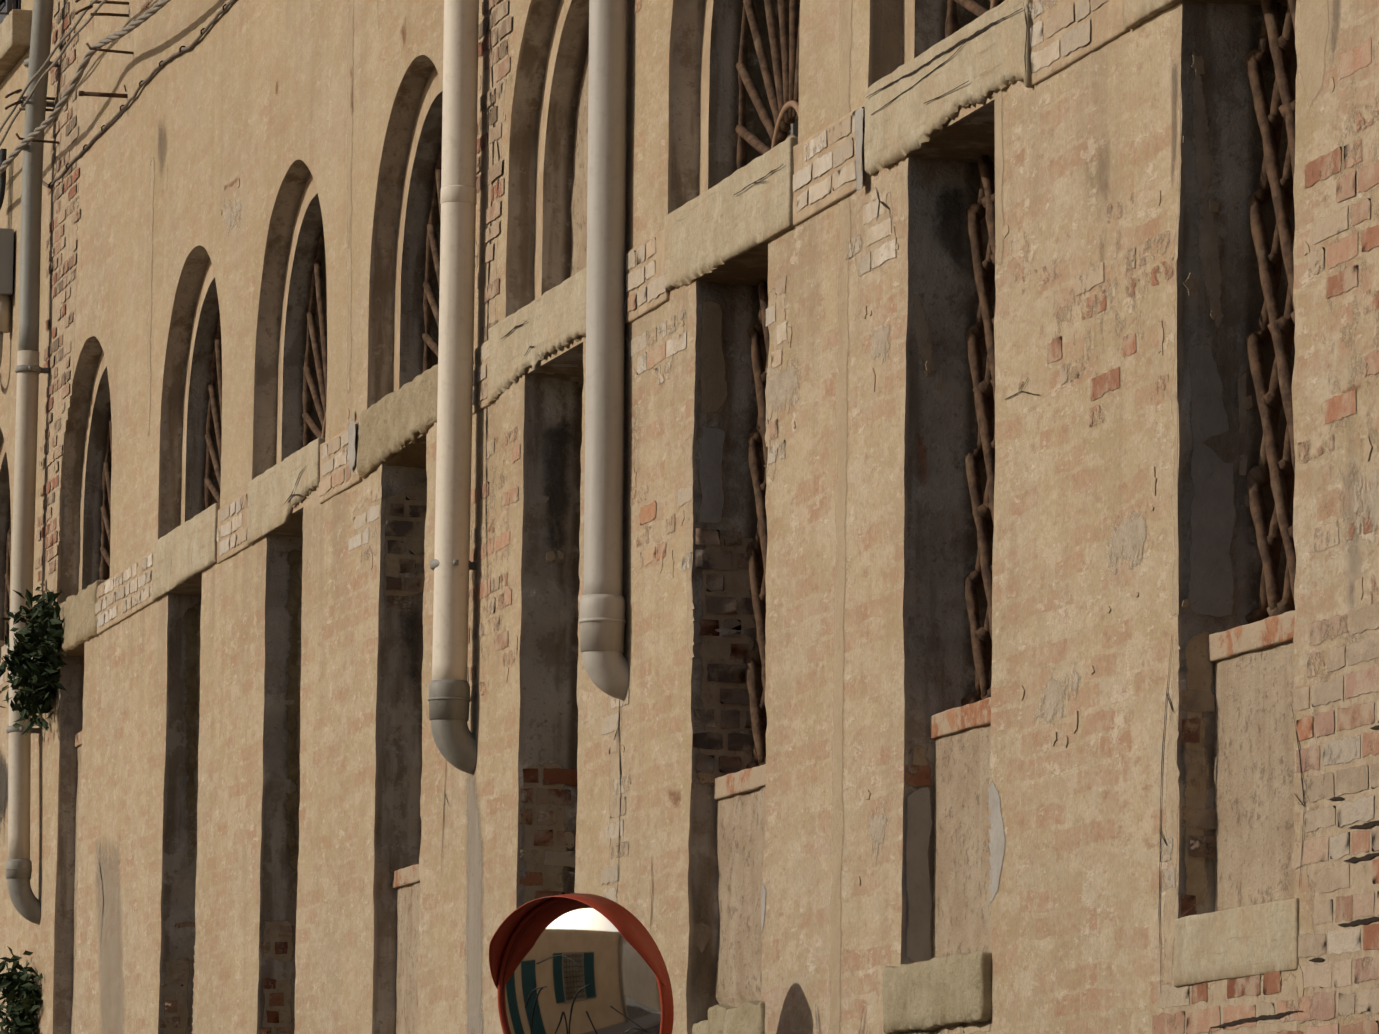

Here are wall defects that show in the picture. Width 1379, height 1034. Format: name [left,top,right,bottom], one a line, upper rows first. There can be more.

crack [866,2,1028,115]
spalling [35,0,80,594]
flaking render [1298,102,1379,552]
leakage [546,422,573,548]
leakage [400,611,421,681]
spalling [520,763,578,905]
spalling [1152,576,1379,1034]